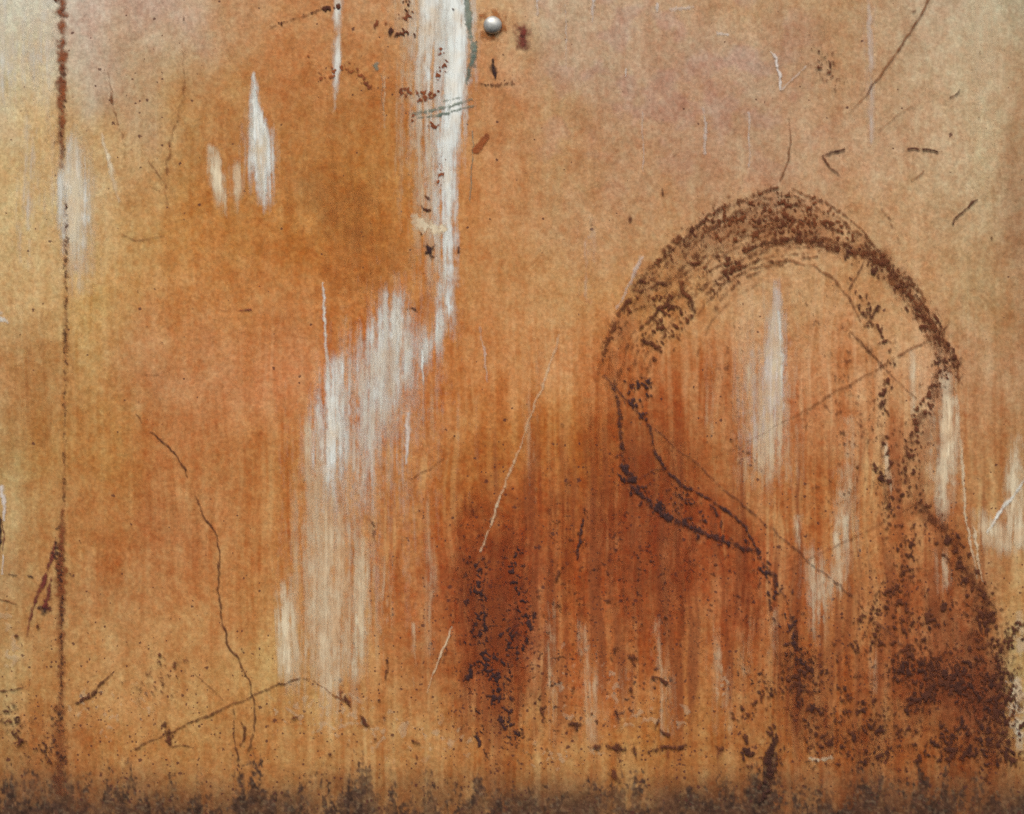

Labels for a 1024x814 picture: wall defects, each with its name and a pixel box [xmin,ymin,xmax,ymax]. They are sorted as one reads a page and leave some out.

rust [54,0,68,158]
peeling [209,73,274,204]
rust [318,62,372,89]
rust [374,0,417,37]
rust [399,87,439,102]
peeling [278,0,473,701]
crack [152,433,186,472]
rust [598,187,1024,783]
rust [28,512,67,649]
crack [197,500,256,767]
rust [463,546,536,758]
rust [739,716,785,803]